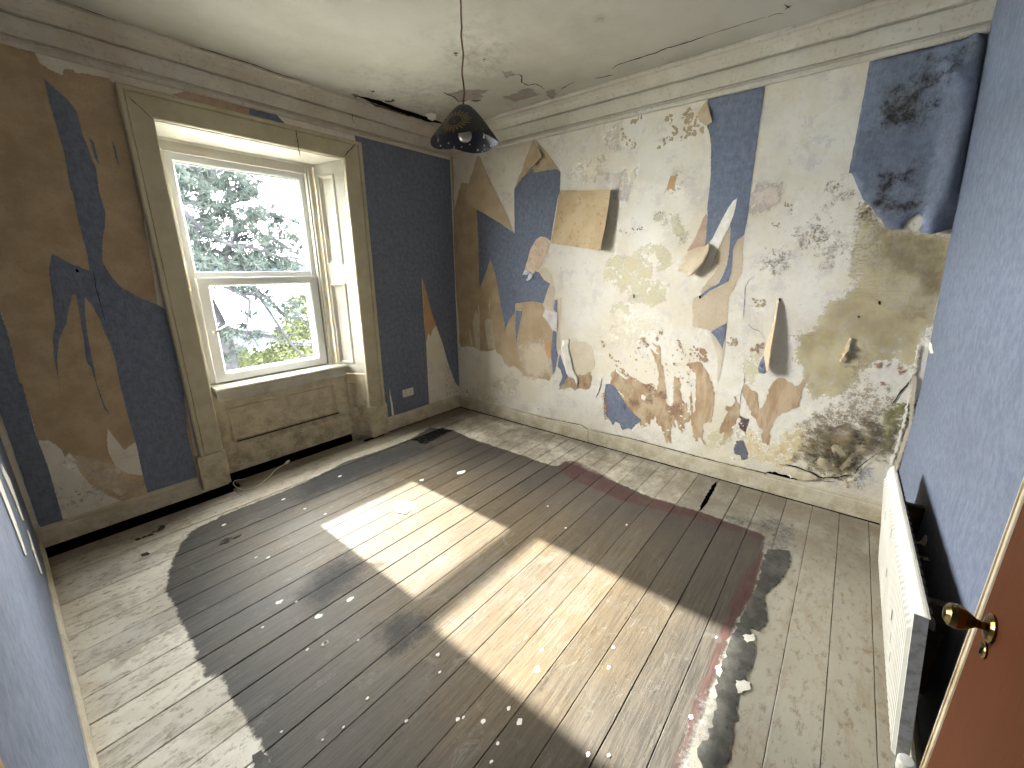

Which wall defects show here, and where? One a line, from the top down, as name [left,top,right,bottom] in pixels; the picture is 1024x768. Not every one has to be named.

peeling [443,89,491,102]
peeling [502,88,557,102]
leakage [880,42,975,128]
leakage [705,170,950,489]
peeling [599,328,708,392]
peeling [730,418,762,460]
crack [779,455,875,482]